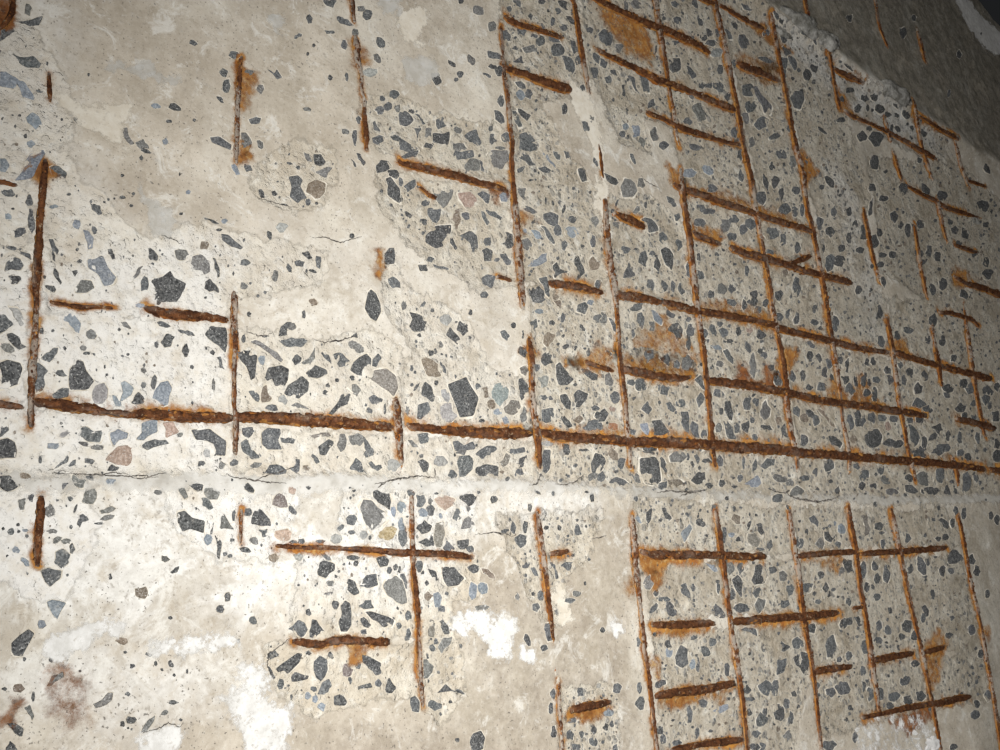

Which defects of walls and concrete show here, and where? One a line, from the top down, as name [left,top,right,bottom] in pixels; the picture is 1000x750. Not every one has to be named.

peeling [955,0,1000,56]
spalling [364,288,382,322]
corrosion [736,346,886,411]
corrosion [445,421,694,451]
corrosion [630,542,703,591]
spalling [134,586,148,599]
spalling [215,592,231,614]
corrosion [314,635,387,665]
corrosion [639,619,711,686]
spalling [2,683,35,750]
spalling [93,692,131,709]
corrosion [860,629,961,736]